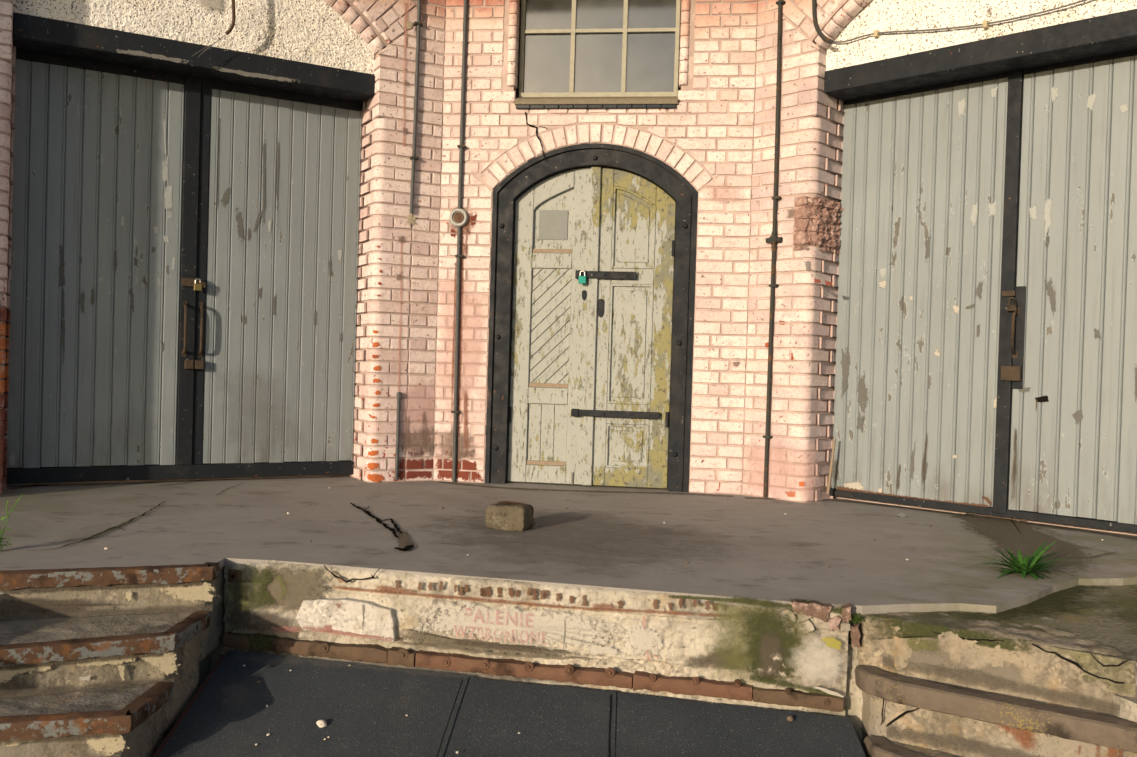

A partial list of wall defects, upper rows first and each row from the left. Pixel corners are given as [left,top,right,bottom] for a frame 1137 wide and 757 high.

crack [525,112,547,162]
spalling [788,196,844,286]
peeling [840,345,868,432]
peeling [833,460,882,493]
crack [324,503,414,583]
peeling [159,582,219,603]
peeling [264,562,665,660]
crack [933,632,1004,642]
peeling [77,652,181,681]
leakage [687,648,748,670]
crack [1032,644,1130,684]
peeling [83,734,130,756]